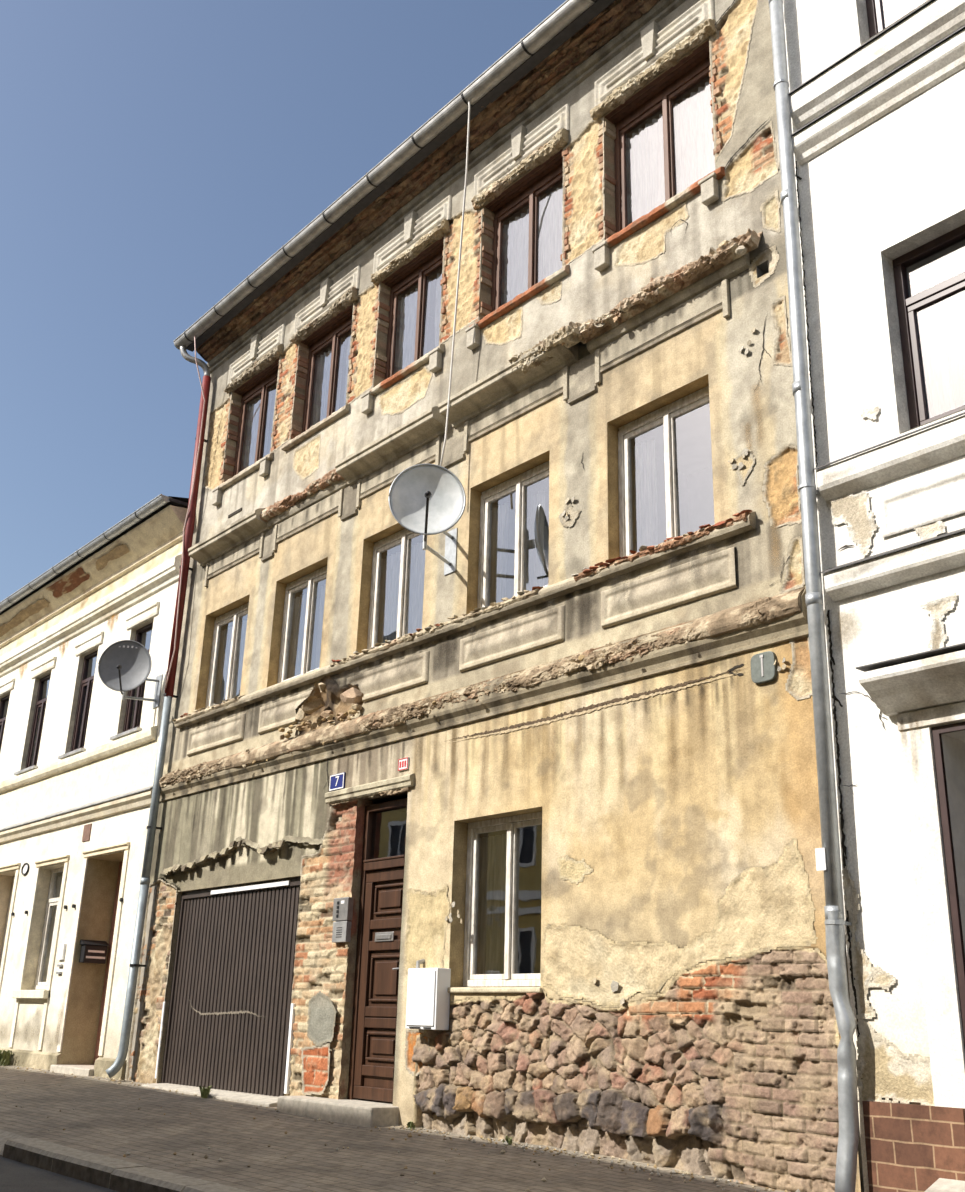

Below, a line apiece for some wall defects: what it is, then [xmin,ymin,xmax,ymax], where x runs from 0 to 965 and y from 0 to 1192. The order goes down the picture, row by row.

flaking render [196,0,781,522]
crack [754,312,771,391]
spalling [159,445,805,787]
peeling [826,490,878,558]
peeling [920,592,957,650]
flaking render [125,787,411,1099]
flaking render [404,838,840,1192]